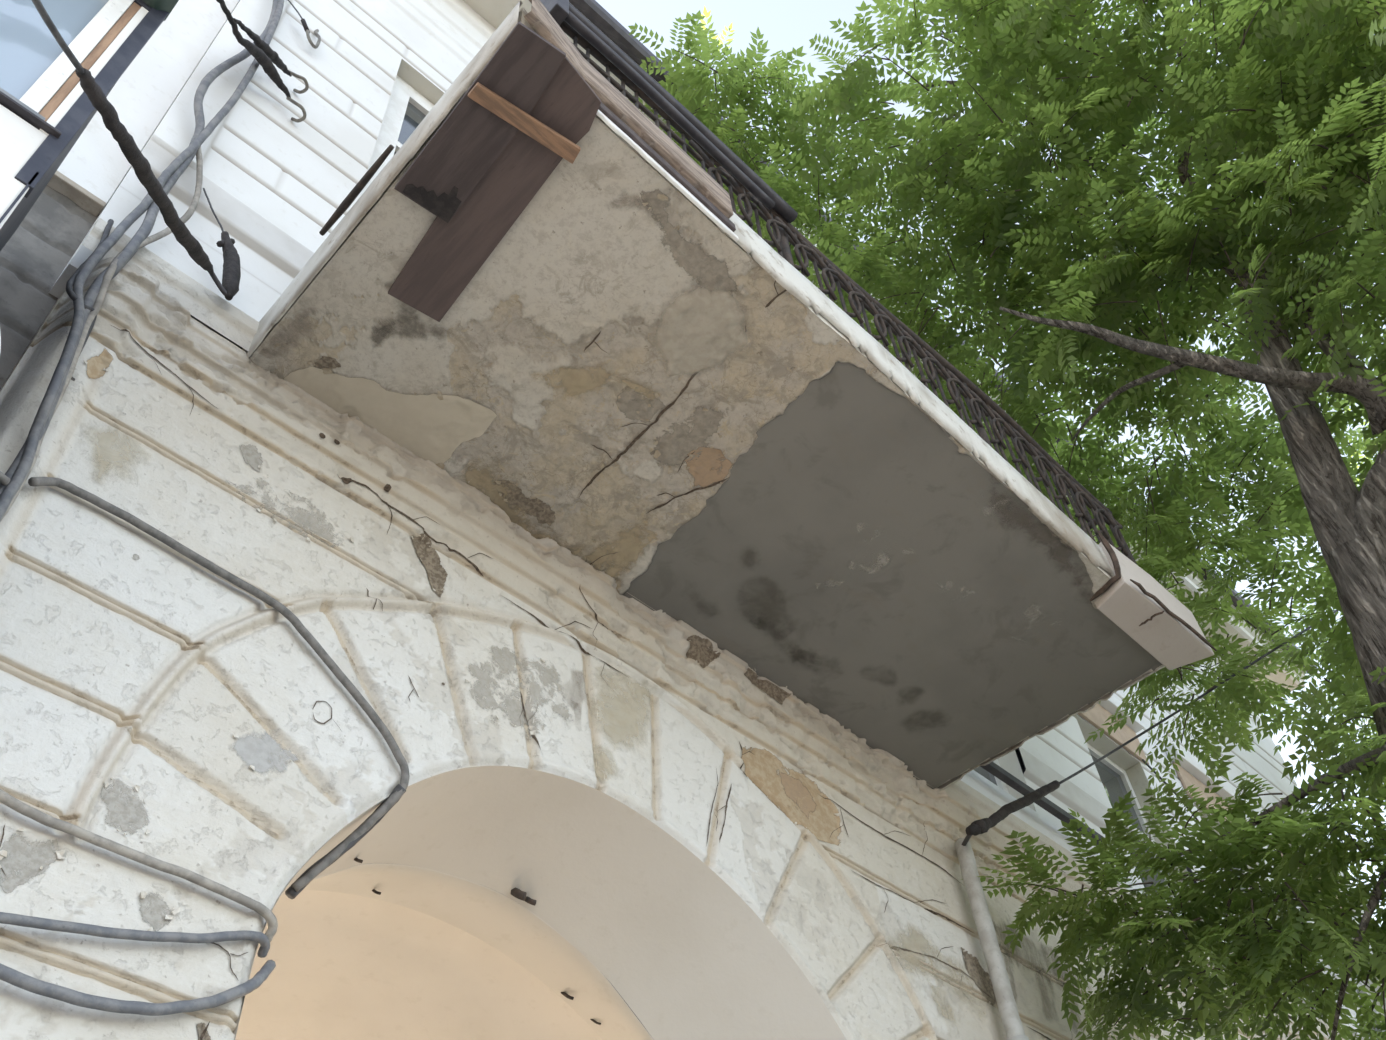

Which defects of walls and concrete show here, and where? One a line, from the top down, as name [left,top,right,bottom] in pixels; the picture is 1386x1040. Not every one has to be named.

peeling [640,190,737,297]
peeling [84,349,113,379]
crack [579,369,702,497]
crack [646,451,728,514]
spalling [411,534,448,597]
crack [338,476,626,685]
crack [1090,530,1217,651]
peeling [465,647,571,738]
spalling [686,635,720,668]
peeling [101,777,151,835]
peeling [741,747,841,846]
peeling [0,828,65,893]